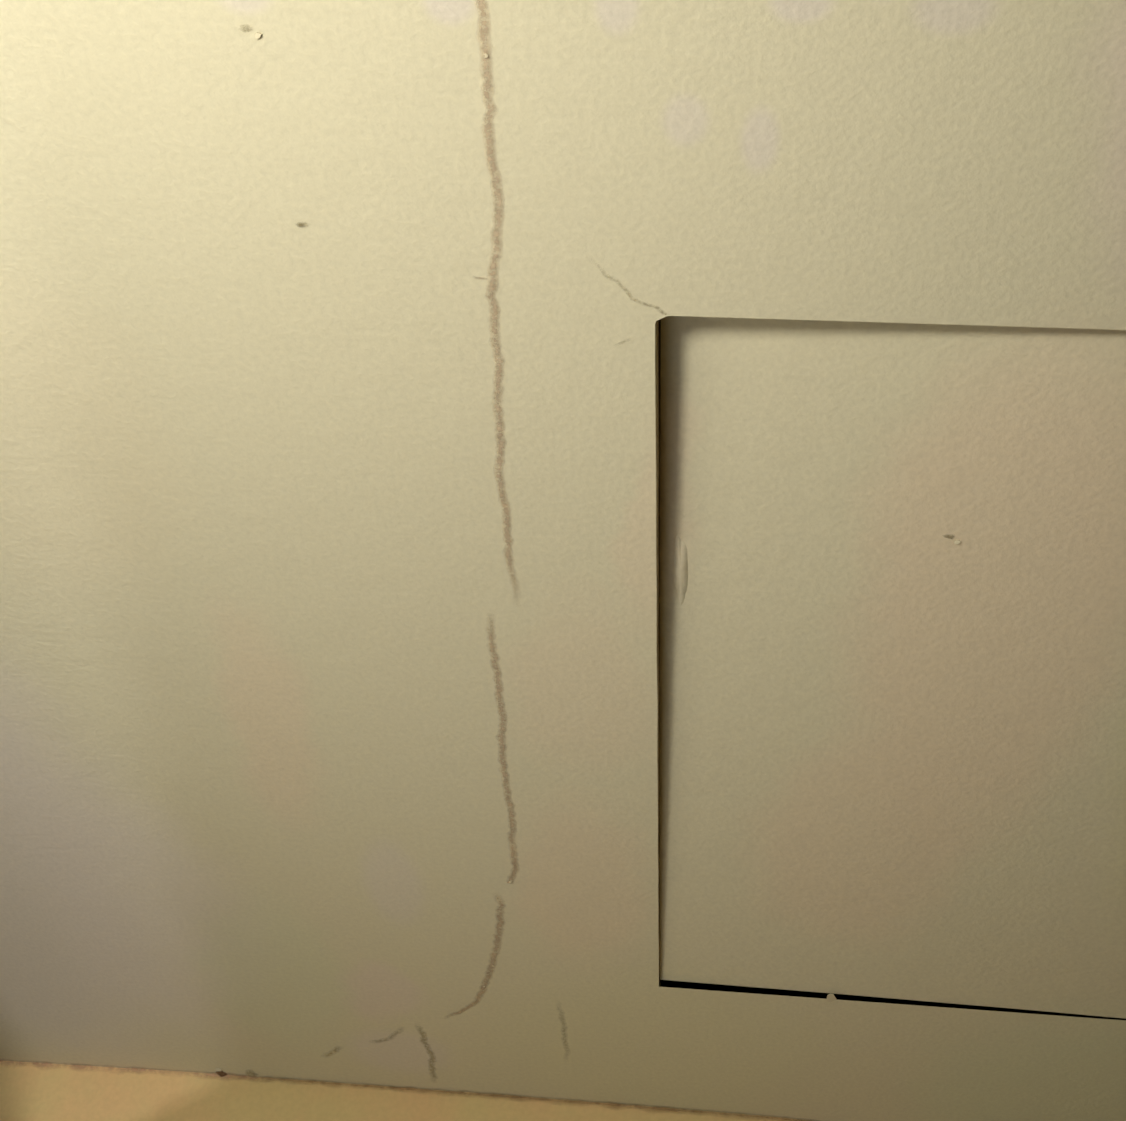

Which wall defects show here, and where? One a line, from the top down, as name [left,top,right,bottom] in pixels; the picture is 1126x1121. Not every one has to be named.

crack [479,0,511,565]
crack [454,634,517,1014]
crack [364,1032,434,1089]
crack [458,1091,530,1099]
crack [575,1101,701,1112]